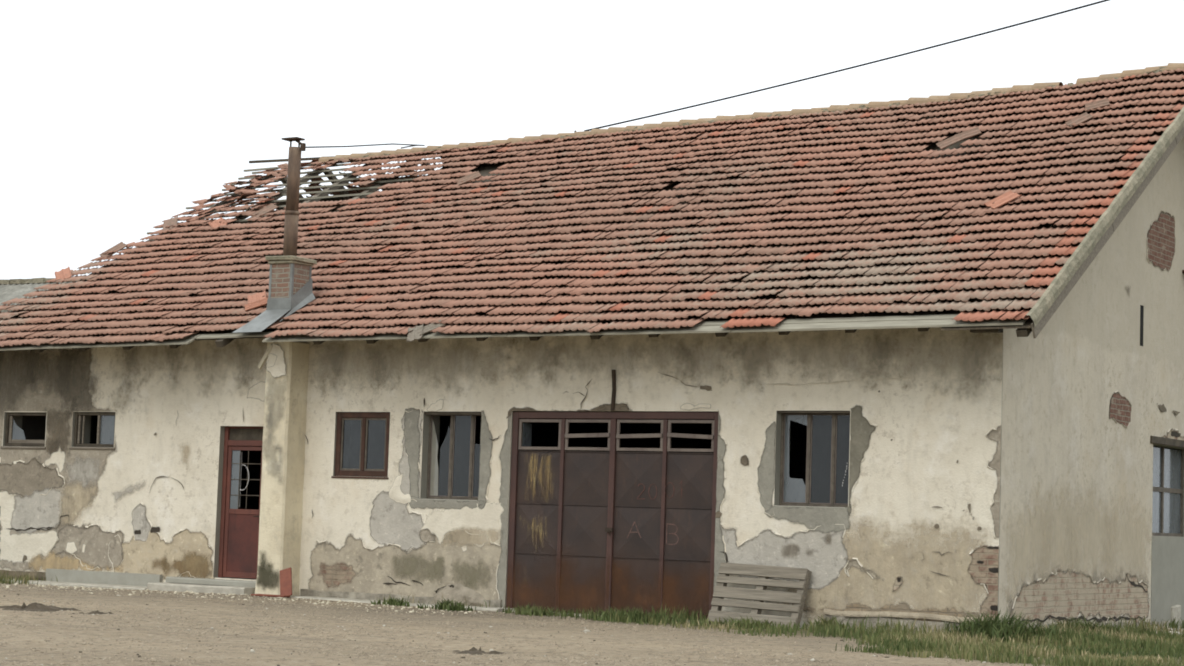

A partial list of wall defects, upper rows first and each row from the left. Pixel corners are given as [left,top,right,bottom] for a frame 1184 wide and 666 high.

flaking render [0,348,214,579]
spalling [308,407,507,608]
flaking render [715,499,880,589]
flaking render [793,426,1149,625]
flaking render [1109,390,1132,428]
spalling [1158,404,1184,445]